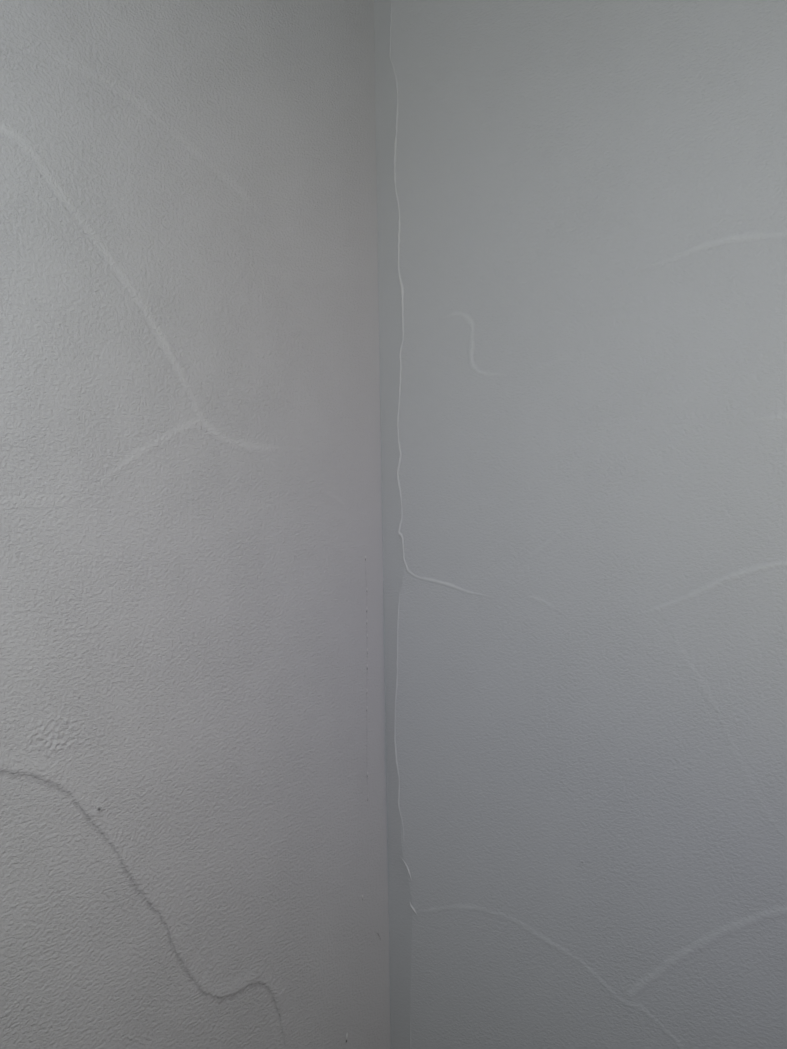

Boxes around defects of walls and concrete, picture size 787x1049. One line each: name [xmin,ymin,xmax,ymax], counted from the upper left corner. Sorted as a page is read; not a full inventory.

crack [389,0,565,916]